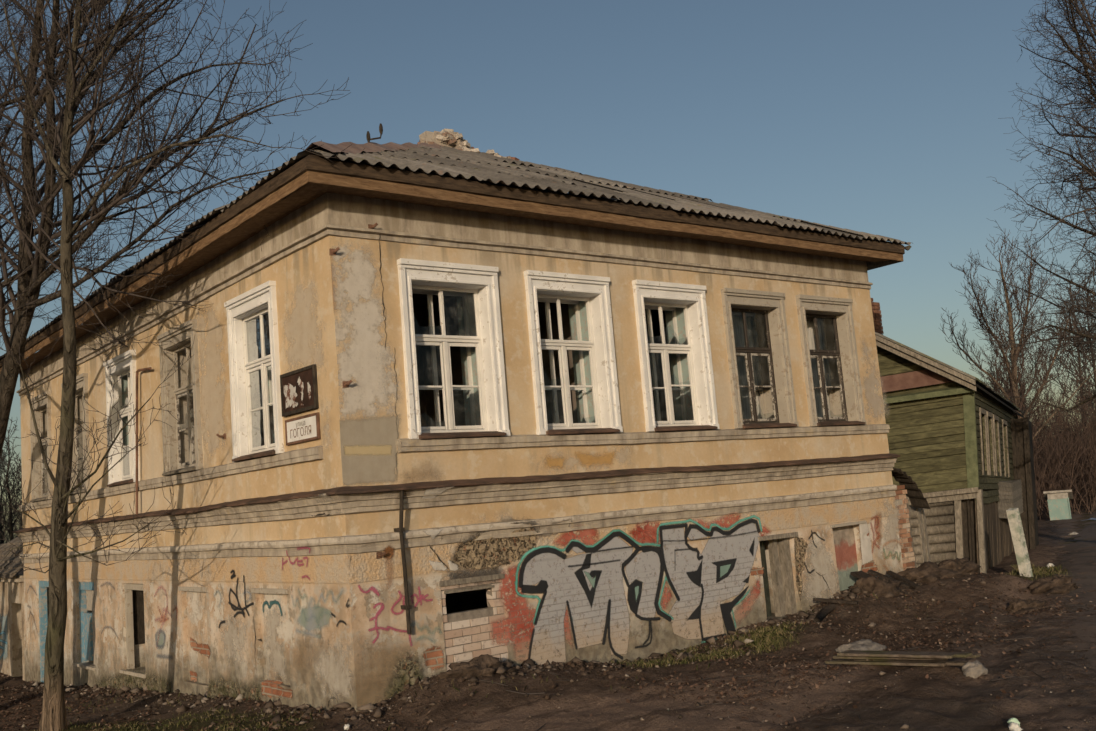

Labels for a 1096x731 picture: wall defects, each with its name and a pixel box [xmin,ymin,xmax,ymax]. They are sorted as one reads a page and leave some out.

peeling [284,282,323,408]
peeling [324,246,399,445]
flaking render [424,517,572,571]
flaking render [862,561,879,579]
flaking render [190,638,211,658]
flaking render [190,670,293,701]